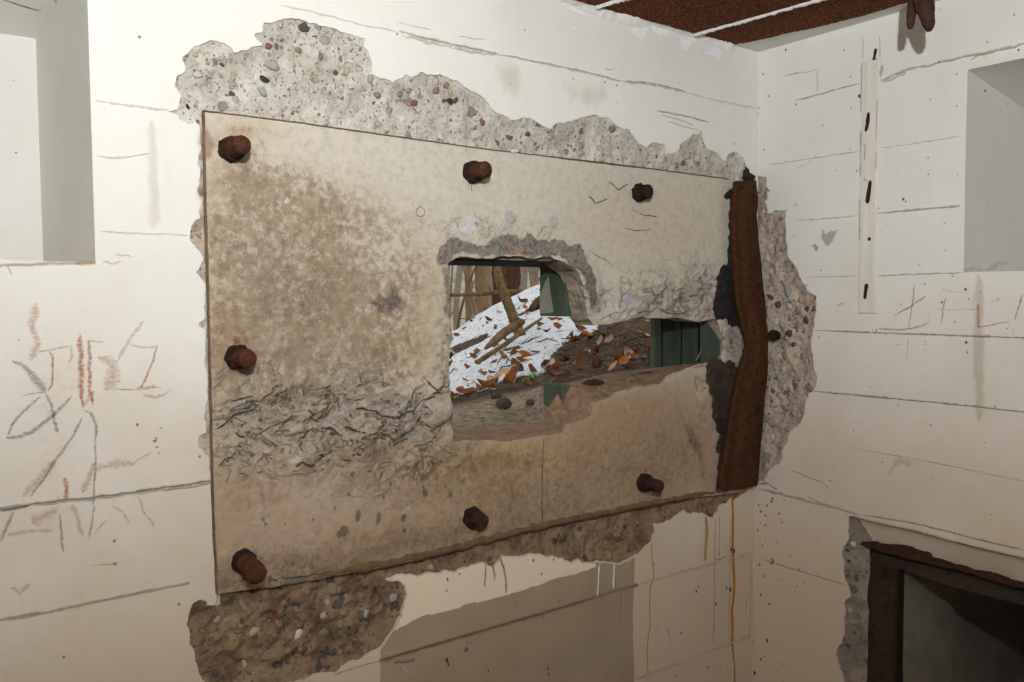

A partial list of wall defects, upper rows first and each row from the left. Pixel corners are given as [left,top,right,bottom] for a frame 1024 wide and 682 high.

spalling [169,19,746,489]
crack [0,378,442,511]
spalling [757,176,817,547]
peeling [186,492,744,682]
spalling [838,516,1024,682]